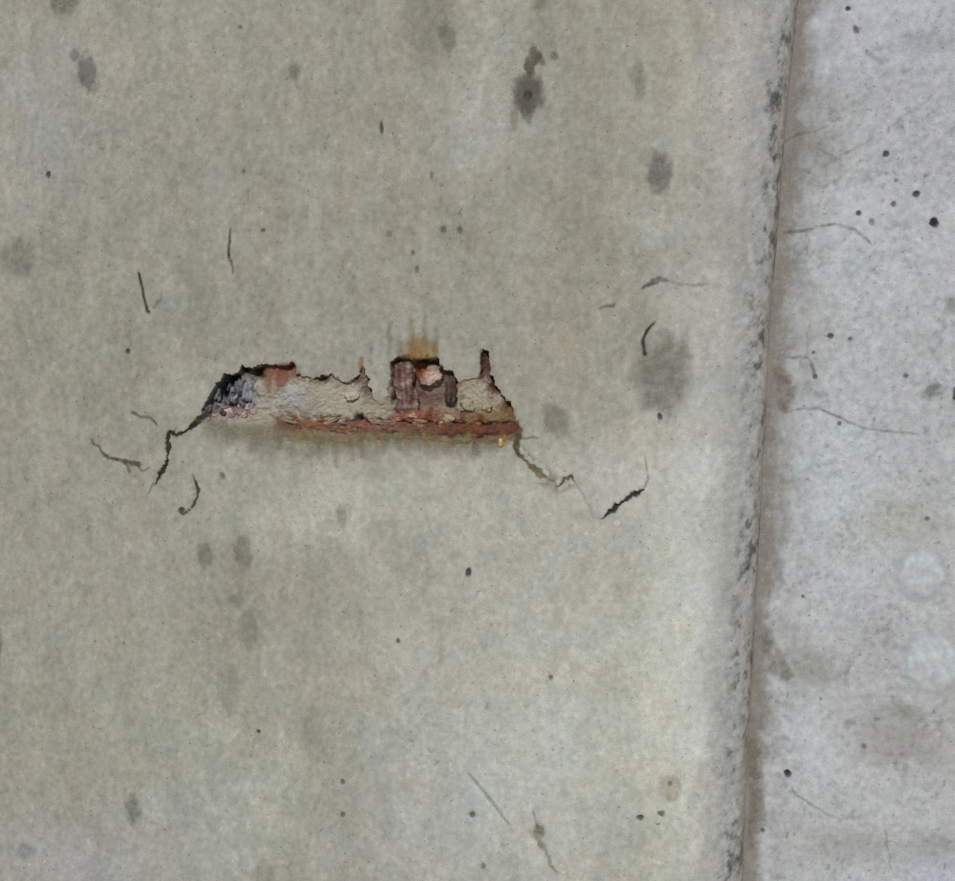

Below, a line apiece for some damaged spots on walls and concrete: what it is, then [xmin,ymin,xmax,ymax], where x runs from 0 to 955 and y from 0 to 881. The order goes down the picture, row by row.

damp [512,47,542,116]
corrosion [408,340,434,358]
spalling [193,344,527,449]
corrosion [214,407,518,452]
crack [93,408,210,516]
crack [506,433,580,493]
crack [597,483,648,524]